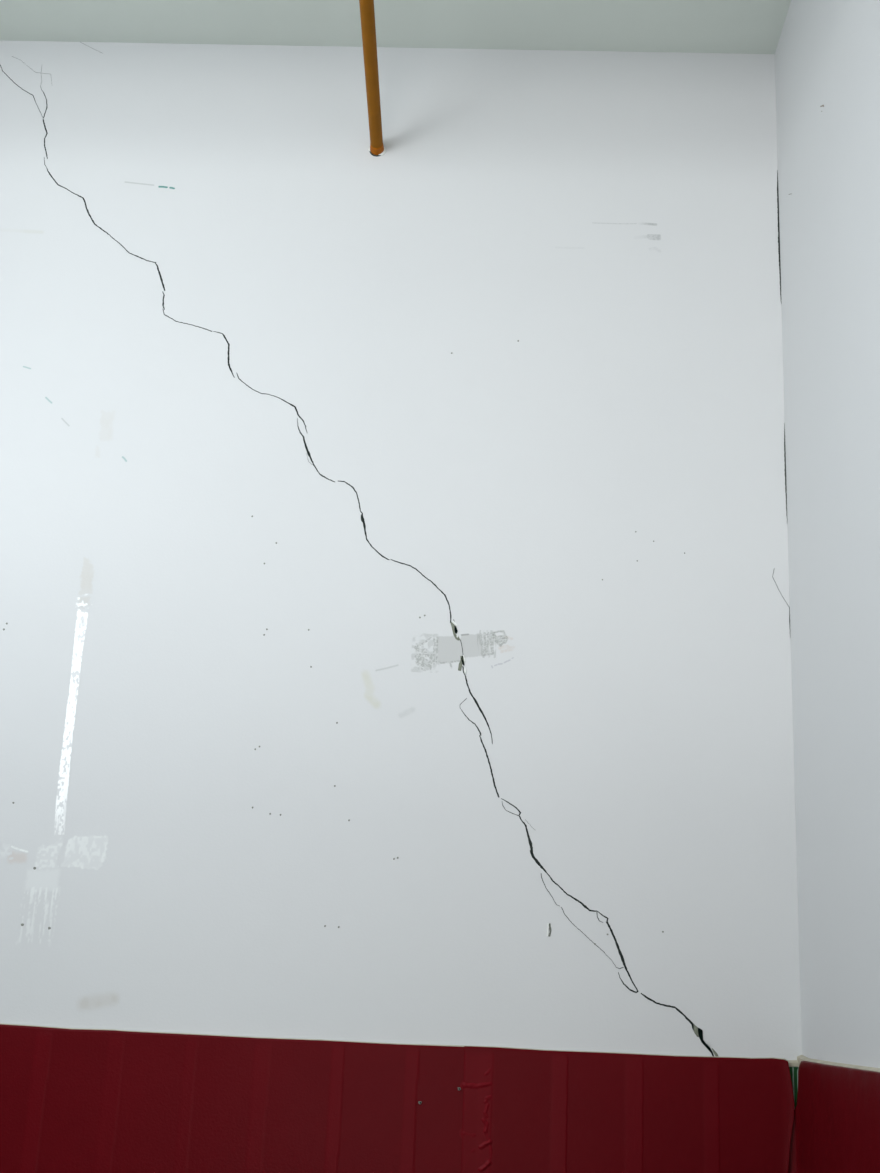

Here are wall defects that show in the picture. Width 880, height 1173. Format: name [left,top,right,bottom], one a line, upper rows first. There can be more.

crack [0,57,693,1024]